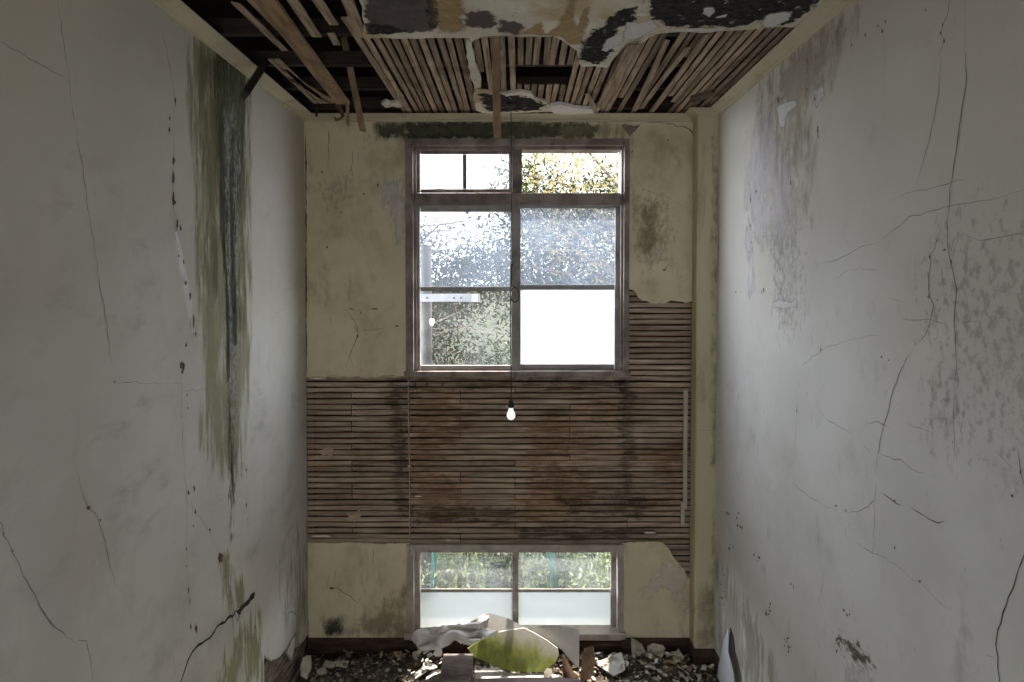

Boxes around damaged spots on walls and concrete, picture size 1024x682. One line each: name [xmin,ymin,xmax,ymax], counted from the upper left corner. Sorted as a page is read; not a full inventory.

flaking render [268,59,335,104]
damp [374,93,599,140]
flaking render [341,16,796,136]
crack [0,0,258,682]
damp [213,52,246,503]
crack [793,1,1024,610]
flaking render [306,289,692,577]
damp [325,620,341,636]
crack [986,555,1024,682]